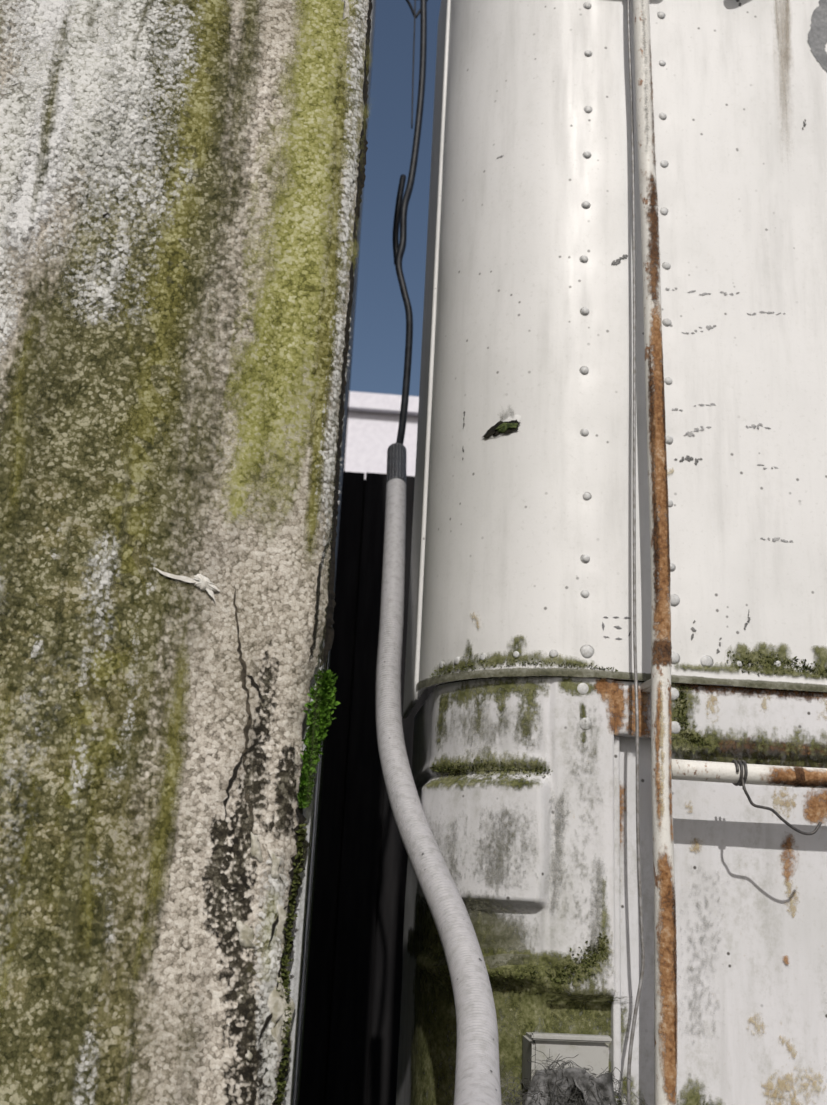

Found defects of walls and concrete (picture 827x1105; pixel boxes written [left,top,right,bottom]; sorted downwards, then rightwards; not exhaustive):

damp [304,0,368,560]
damp [225,295,282,521]
damp [0,0,261,1105]
crack [223,586,269,833]
damp [268,746,299,837]
damp [248,1045,270,1105]